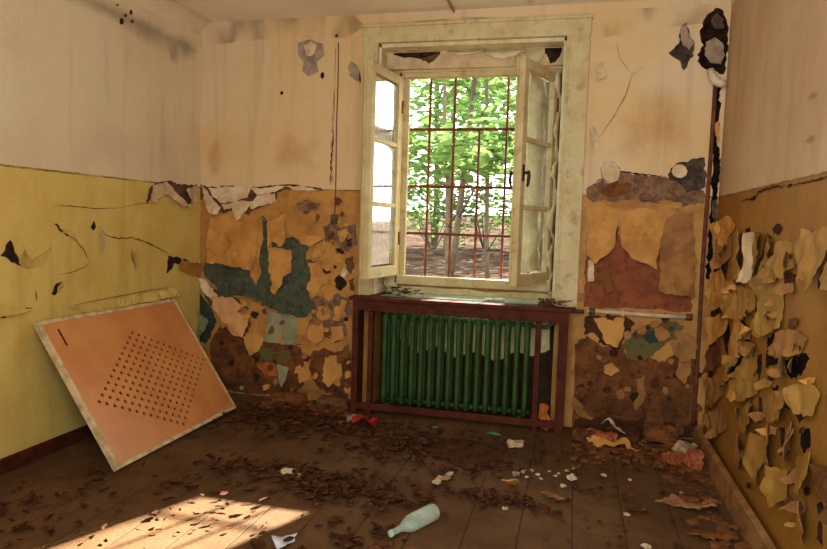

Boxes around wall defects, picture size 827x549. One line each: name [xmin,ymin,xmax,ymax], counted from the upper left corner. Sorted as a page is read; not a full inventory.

spalling [298,39,324,79]
spalling [668,8,729,74]
peeling [1,240,52,268]
peeling [146,181,357,400]
peeling [571,87,827,549]